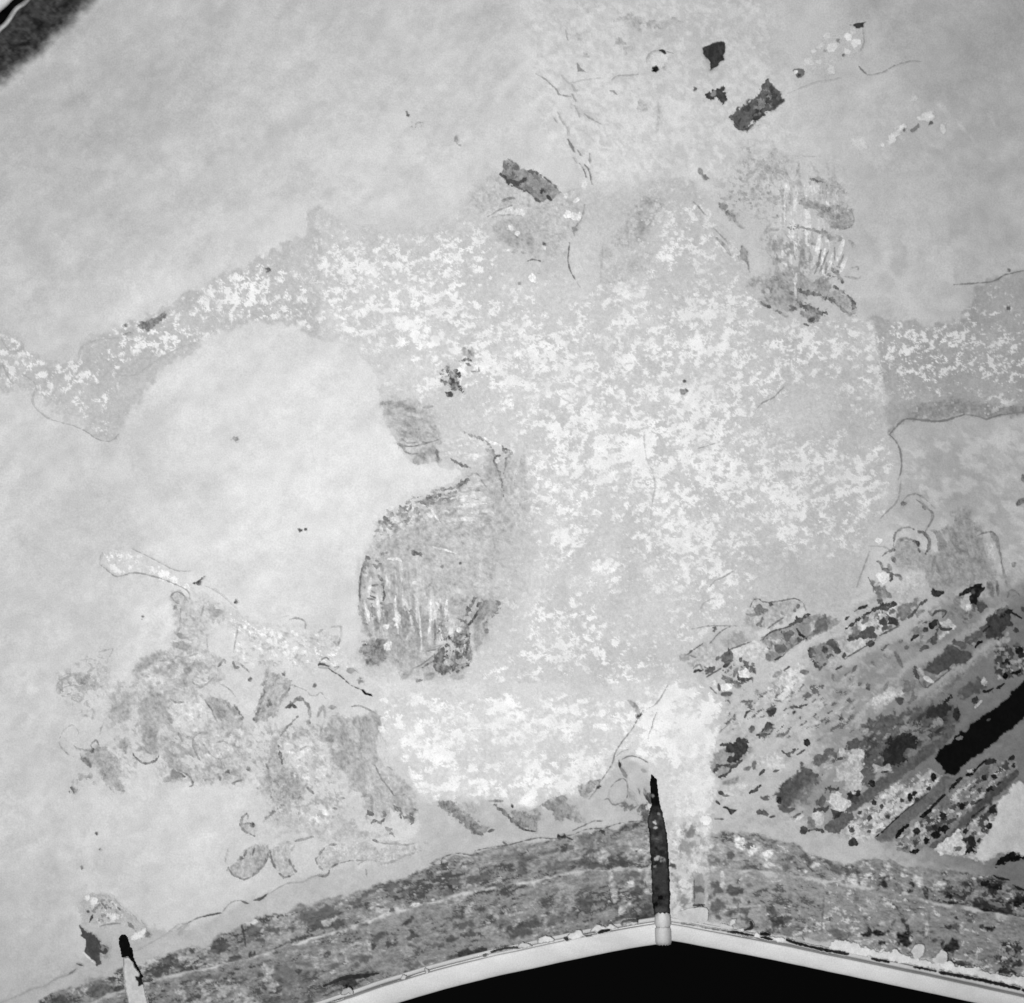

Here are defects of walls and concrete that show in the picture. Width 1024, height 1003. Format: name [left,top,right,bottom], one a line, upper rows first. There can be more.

spalling [702,40,726,71]
spalling [692,77,786,133]
spalling [499,157,563,204]
leakage [717,194,746,230]
leakage [737,244,751,273]
leakage [438,345,480,398]
crack [879,410,1024,520]
flaking render [0,172,1024,842]
crack [855,545,891,588]
leakage [627,699,643,721]
spalling [970,780,1024,865]
leakage [669,823,710,911]